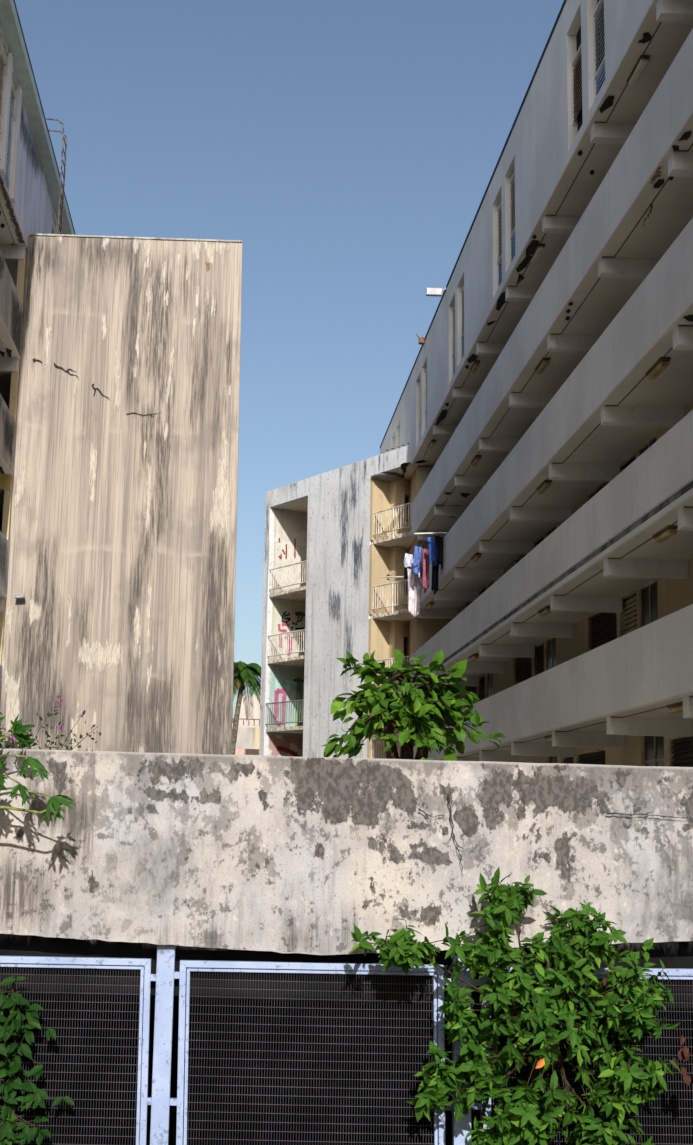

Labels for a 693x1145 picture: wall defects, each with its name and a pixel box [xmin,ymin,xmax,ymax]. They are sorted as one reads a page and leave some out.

damp [12,287,30,349]
damp [82,238,231,416]
crack [33,358,162,416]
damp [127,417,173,753]
damp [194,415,231,755]
damp [2,548,98,751]
peeling [40,754,71,794]
peeling [135,756,632,927]
crack [418,794,465,877]
peeling [621,803,650,839]
peeling [677,785,693,834]
damp [3,864,38,917]